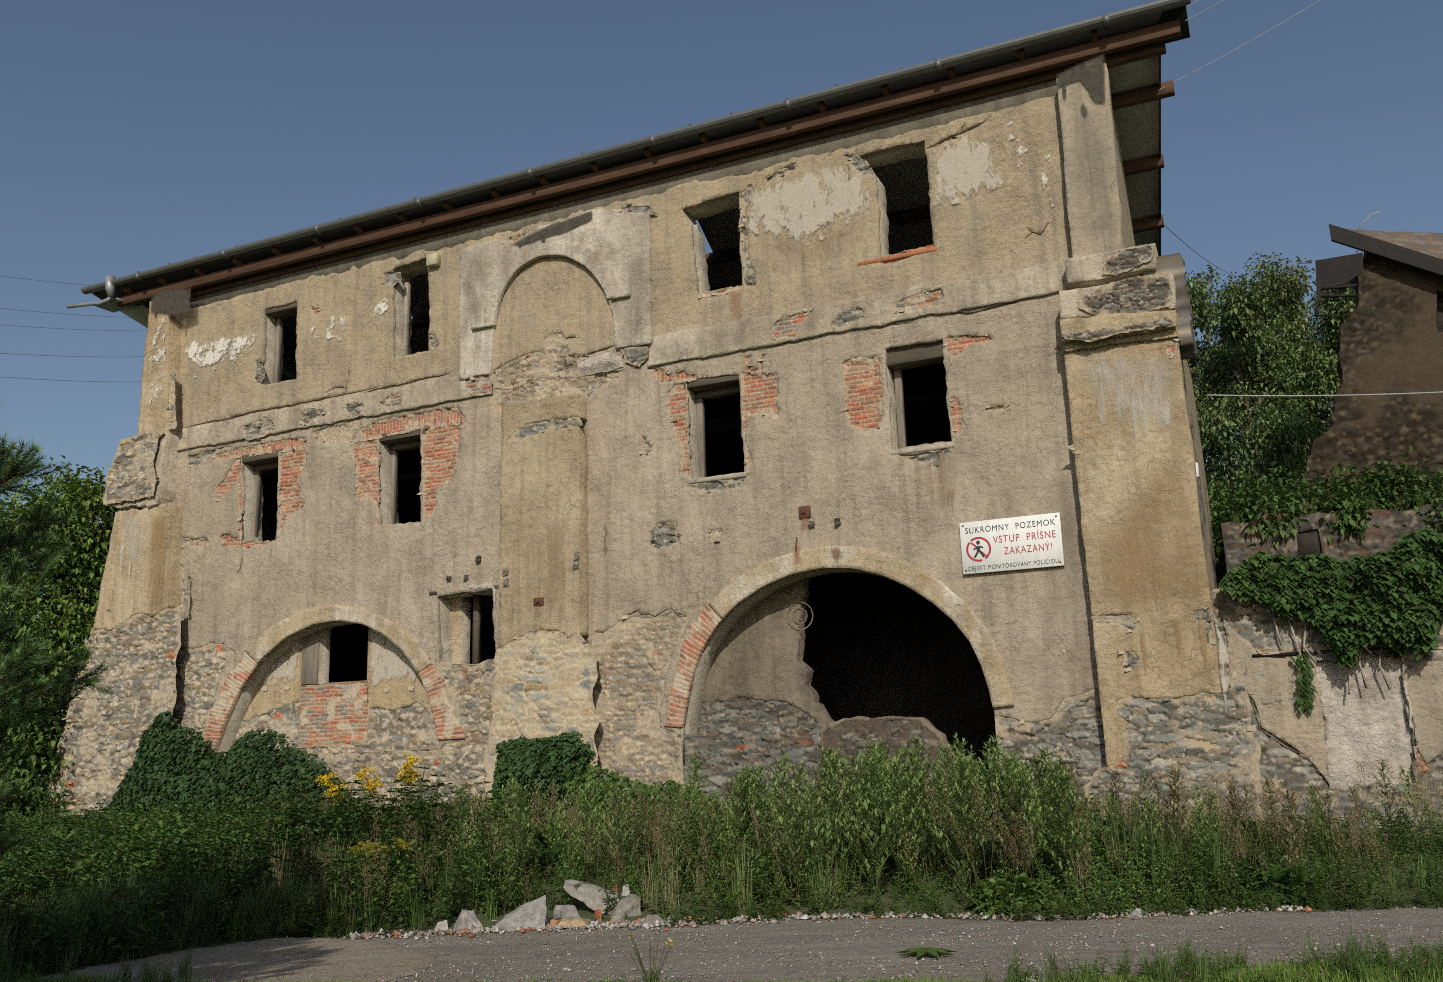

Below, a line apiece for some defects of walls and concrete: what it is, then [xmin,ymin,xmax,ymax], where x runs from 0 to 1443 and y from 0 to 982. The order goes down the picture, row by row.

peeling [699,152,874,299]
spalling [105,318,177,505]
peeling [185,335,265,385]
flaking render [180,394,465,567]
spalling [428,333,438,351]
spalling [465,308,813,493]
flaking render [842,355,883,432]
spalling [906,398,966,471]
spalling [1050,244,1181,358]
spalling [650,521,681,549]
crack [1230,686,1329,784]